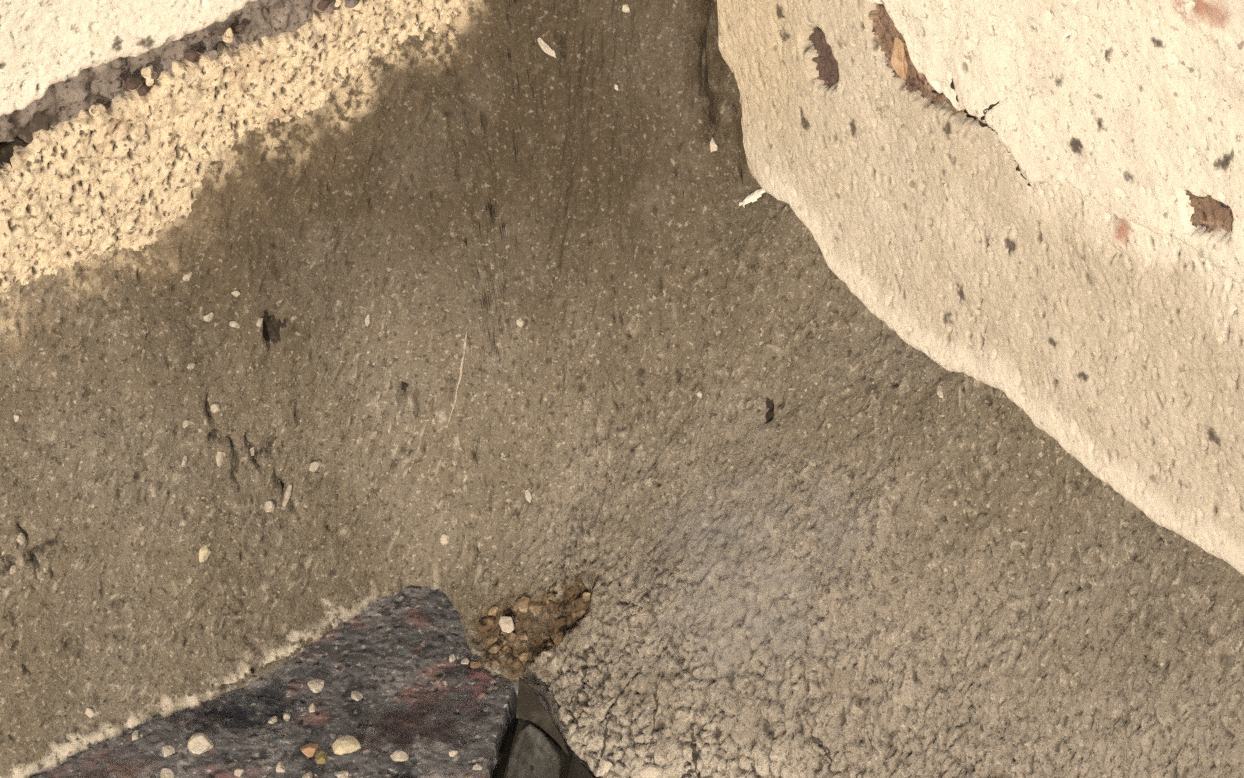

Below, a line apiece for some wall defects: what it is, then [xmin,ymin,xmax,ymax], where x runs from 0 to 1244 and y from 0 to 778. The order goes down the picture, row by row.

crack [0,0,359,168]
spalling [809,29,839,89]
spalling [868,3,976,135]
crack [931,78,1032,187]
spalling [1185,192,1234,233]
damp [162,586,376,731]
spalling [470,566,600,680]
damp [0,715,142,778]